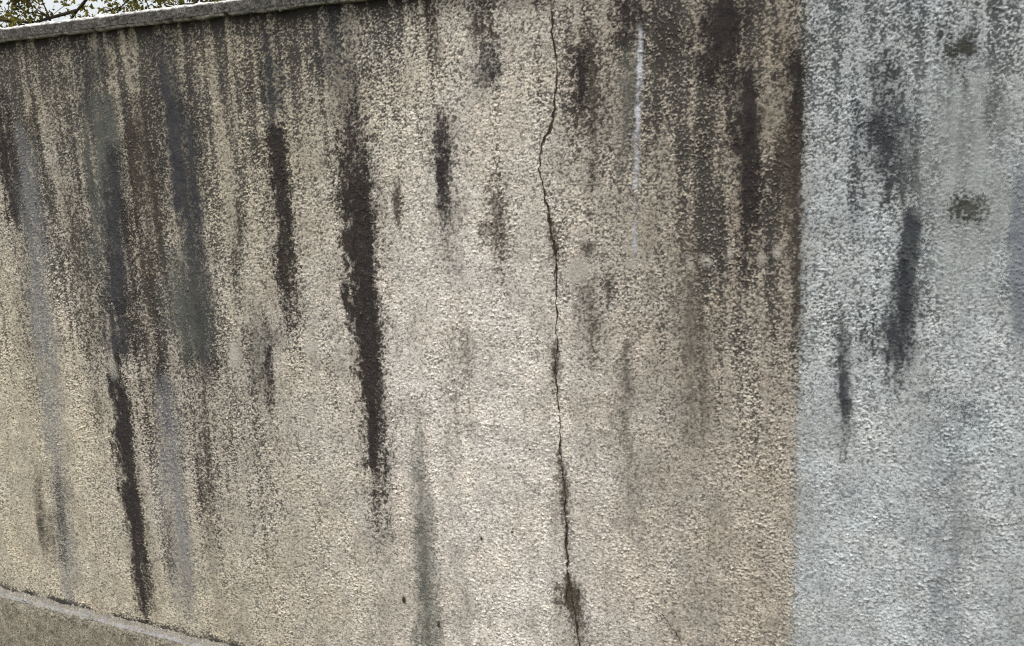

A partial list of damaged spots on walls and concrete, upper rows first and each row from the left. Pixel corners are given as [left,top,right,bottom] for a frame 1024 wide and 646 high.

water stain [0,95,43,243]
water stain [60,36,215,623]
water stain [264,40,298,329]
water stain [335,92,390,523]
water stain [430,111,453,240]
water stain [480,175,509,270]
crack [527,0,580,646]
water stain [570,19,606,192]
water stain [607,0,648,188]
water stain [689,0,805,358]
water stain [832,50,925,436]
water stain [936,25,1024,334]